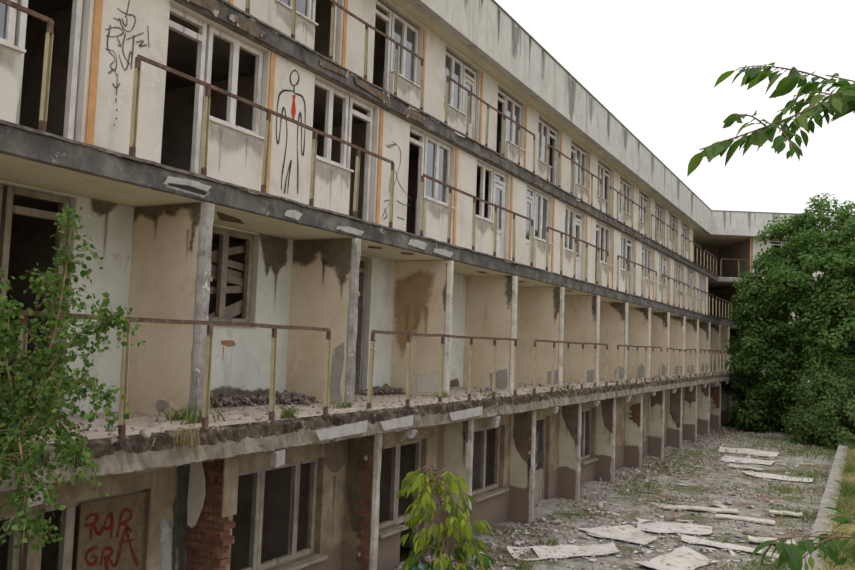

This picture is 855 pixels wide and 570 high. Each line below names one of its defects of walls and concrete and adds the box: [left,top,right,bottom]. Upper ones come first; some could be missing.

water stain [91,199,117,221]
water stain [134,203,201,250]
water stain [259,233,352,291]
water stain [395,272,433,350]
peeling [316,420,368,440]
water stain [158,465,190,570]
flaking render [185,457,240,570]